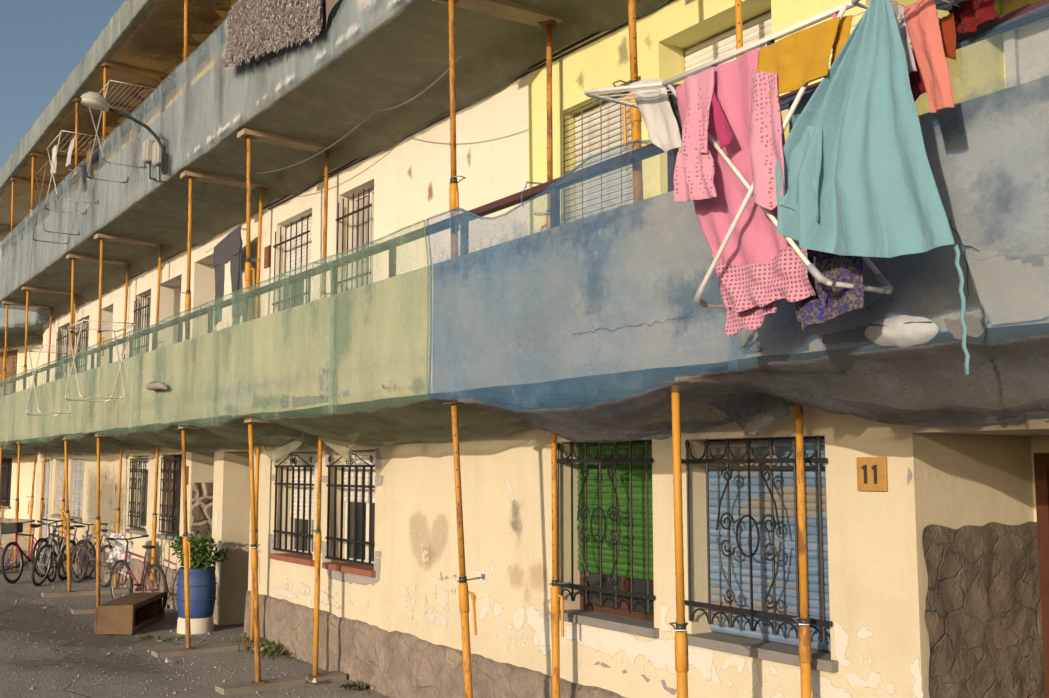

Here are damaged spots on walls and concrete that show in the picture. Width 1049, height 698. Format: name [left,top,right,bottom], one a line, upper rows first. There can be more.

crack [949,219,979,301]
peeling [274,579,351,609]
peeling [471,562,552,655]
peeling [565,604,677,695]
peeling [688,645,785,698]
peeling [796,619,895,698]
peeling [909,658,924,698]